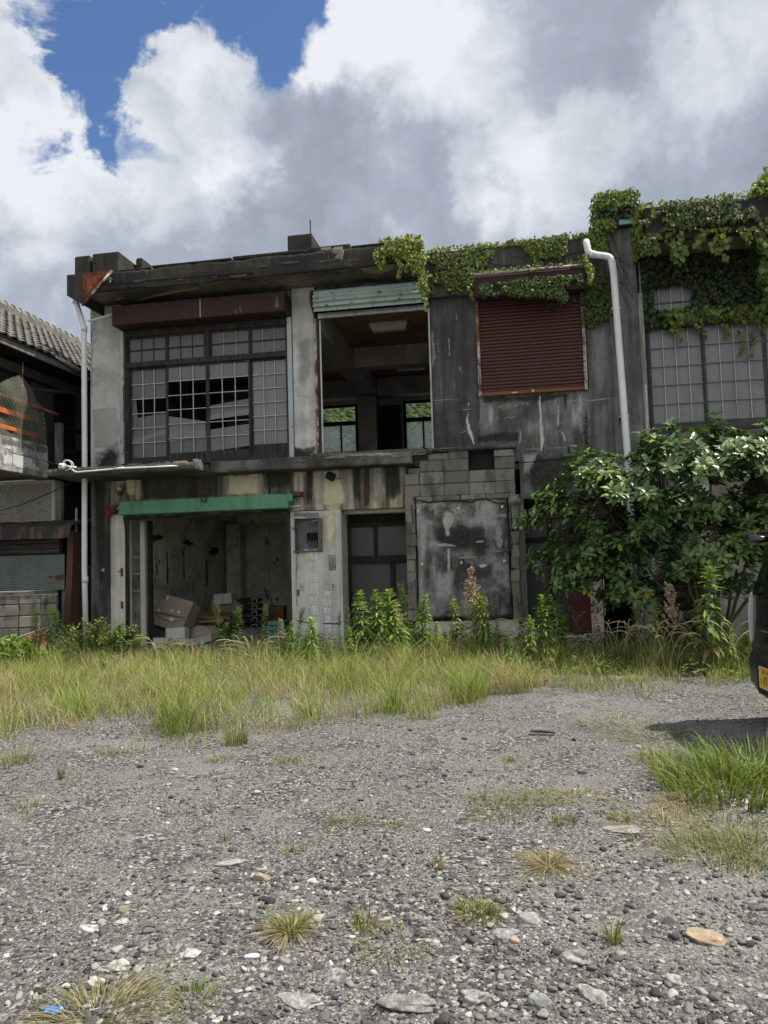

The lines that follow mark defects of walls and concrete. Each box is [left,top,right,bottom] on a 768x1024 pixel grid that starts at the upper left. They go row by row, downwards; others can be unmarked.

water stain [519,328,612,492]
water stain [297,469,360,503]
water stain [373,468,381,501]
water stain [476,514,506,552]
water stain [419,512,476,605]